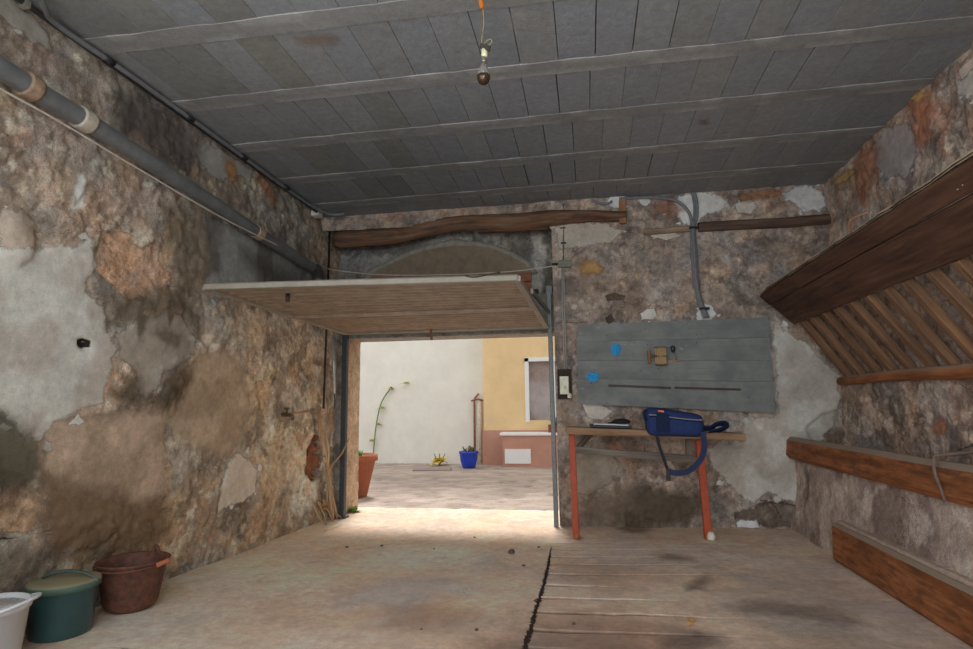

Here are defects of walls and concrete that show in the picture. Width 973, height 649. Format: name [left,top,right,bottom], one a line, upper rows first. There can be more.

damp [0,419,35,483]
spalling [822,408,848,445]
damp [43,478,167,563]
crack [522,548,552,649]